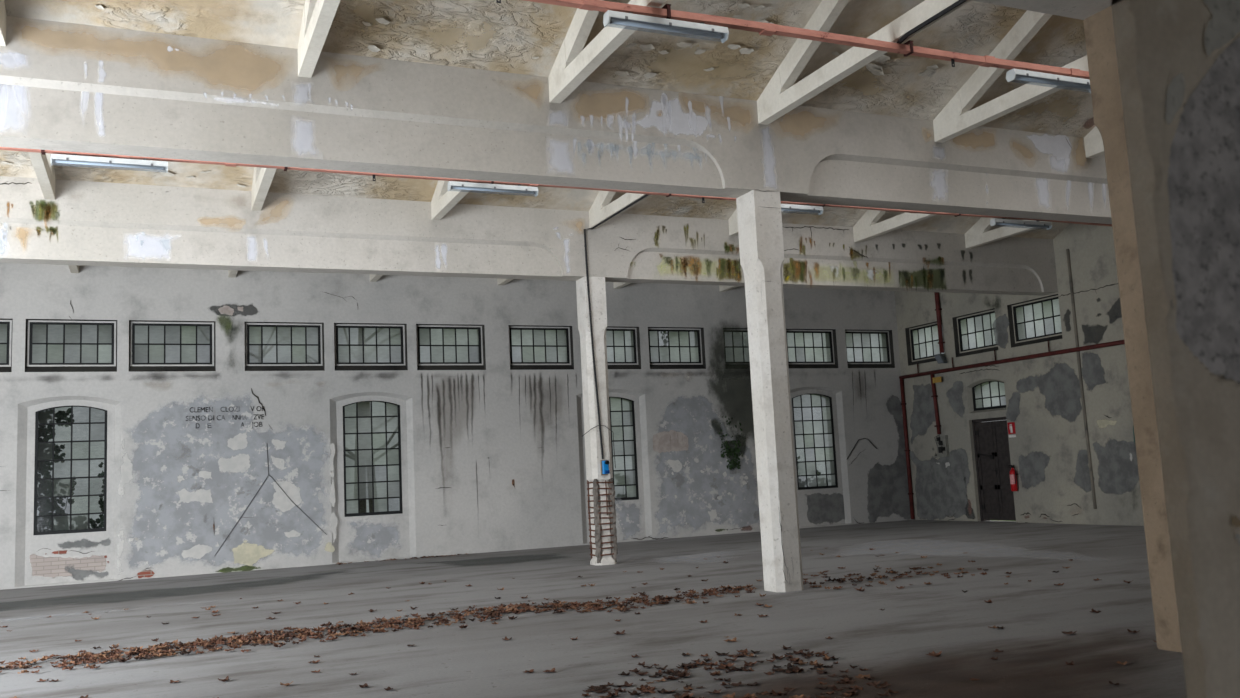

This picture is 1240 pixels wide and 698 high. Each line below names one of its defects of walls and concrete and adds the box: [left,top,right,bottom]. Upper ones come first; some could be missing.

damp [23,28,277,134]
peeling [581,93,736,151]
damp [1,201,59,244]
damp [654,224,741,281]
damp [783,237,944,289]
flaking render [1006,298,1122,422]
damp [421,376,485,432]
flaking render [30,398,398,581]
spalling [587,478,640,563]
flaking render [653,396,760,533]
flaking render [867,381,975,523]
flaking render [1074,439,1139,494]